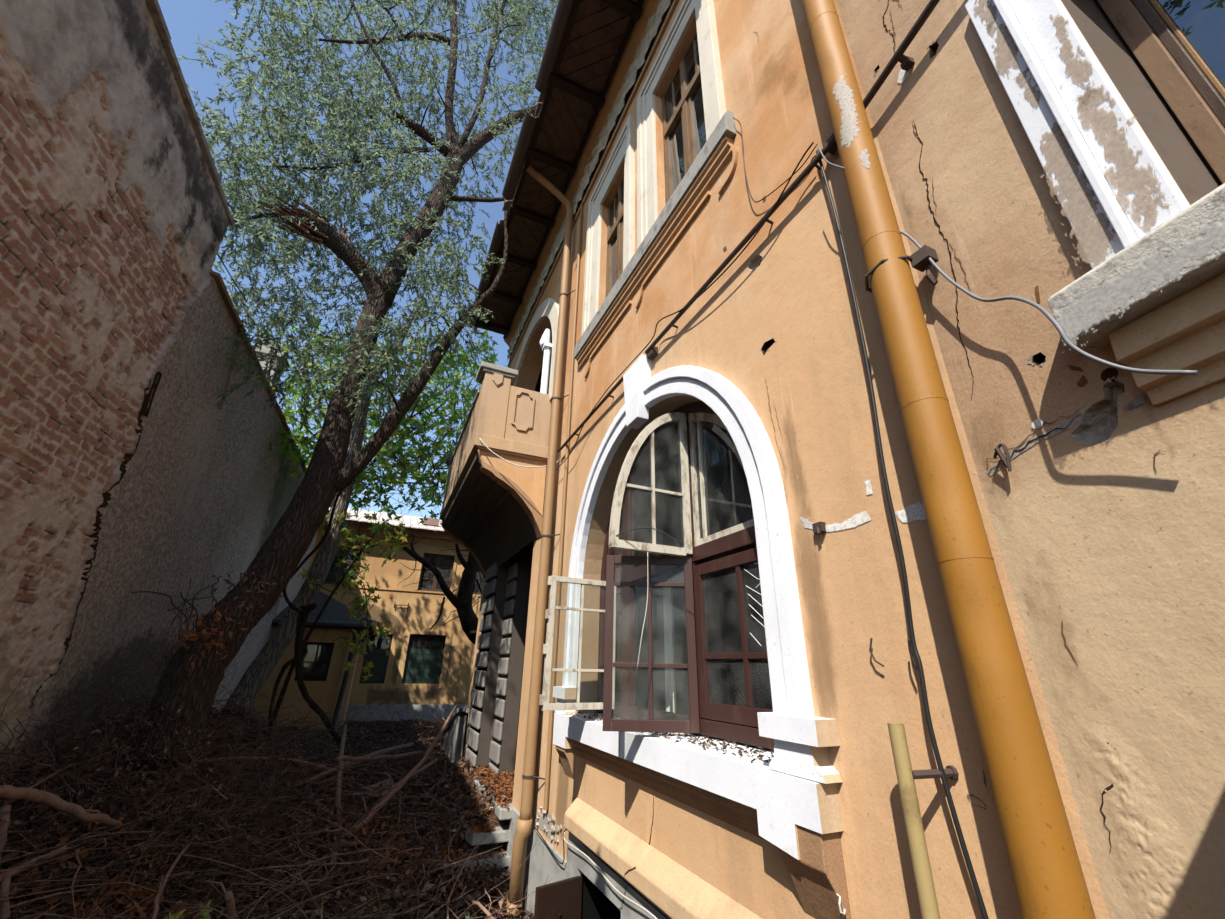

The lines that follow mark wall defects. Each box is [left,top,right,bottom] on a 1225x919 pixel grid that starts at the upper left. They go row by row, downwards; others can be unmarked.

spalling [140,371,163,418]
peeling [832,73,870,168]
crack [879,0,902,52]
crack [912,119,974,400]
peeling [974,0,1225,476]
crack [29,379,151,709]